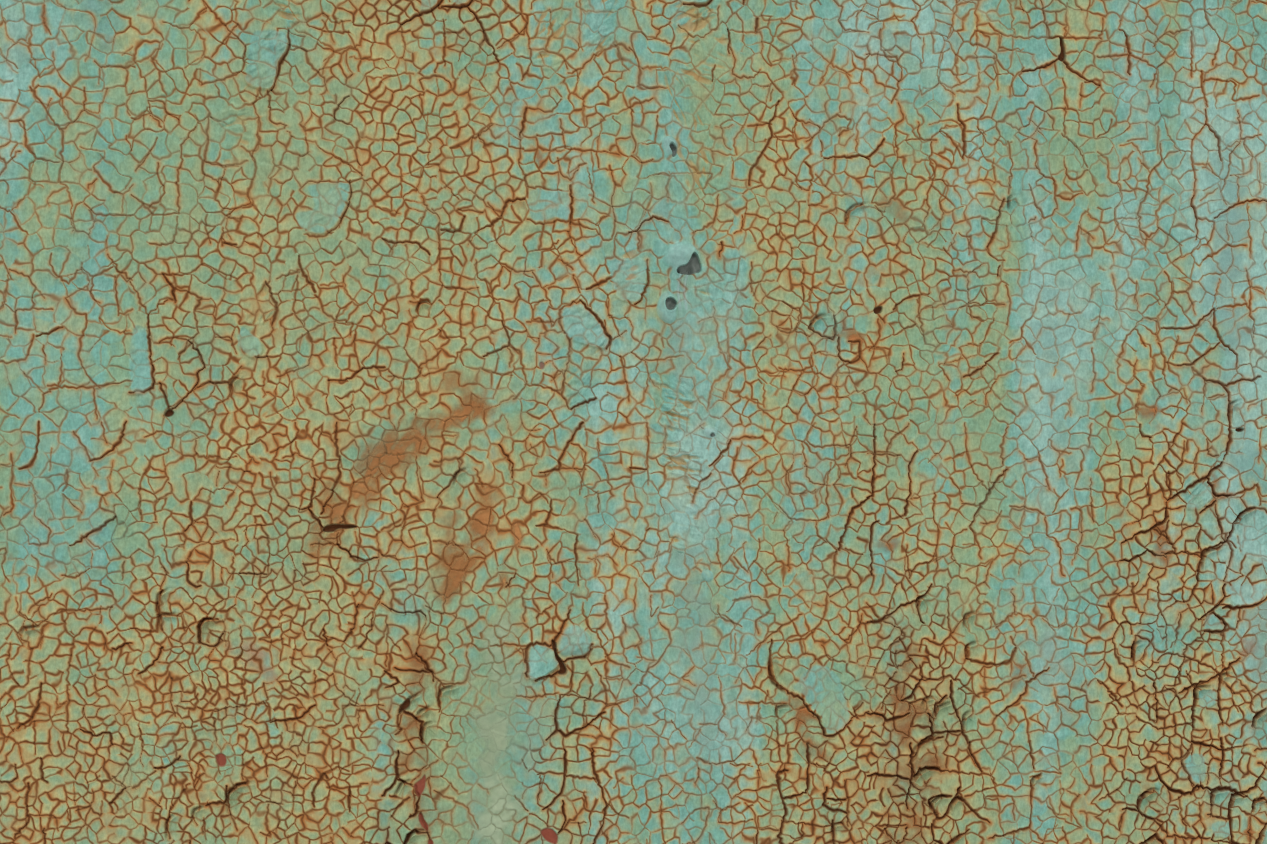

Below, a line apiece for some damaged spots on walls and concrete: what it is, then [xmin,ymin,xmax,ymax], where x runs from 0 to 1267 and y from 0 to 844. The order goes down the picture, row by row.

crack [997,0,1267,293]
corrosion [329,400,485,542]
crack [952,422,1104,576]
peeling [1185,481,1214,511]
peeling [1203,509,1267,606]
peeling [1203,613,1225,631]
peeling [399,687,461,744]
crack [0,793,27,833]
crack [109,797,168,844]
peeling [409,831,429,844]
crack [786,824,816,844]
crack [1225,793,1267,844]